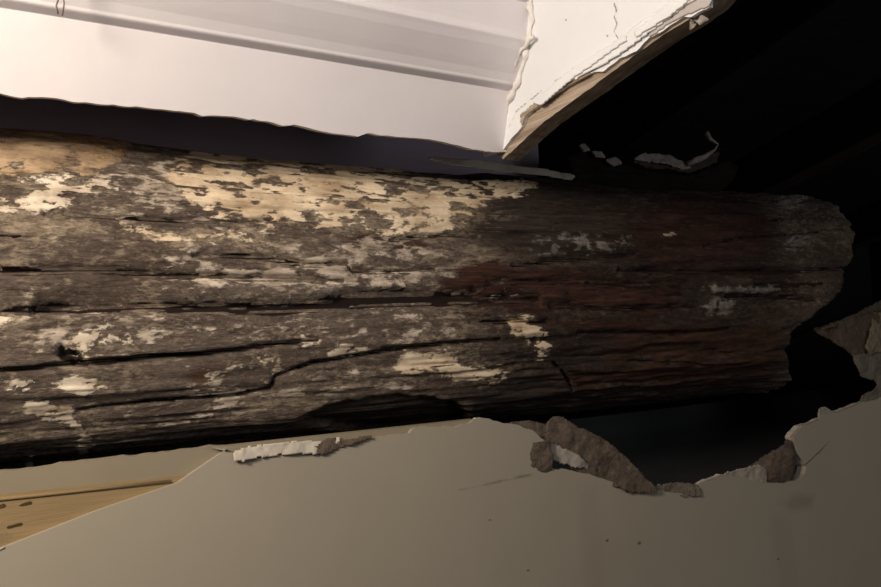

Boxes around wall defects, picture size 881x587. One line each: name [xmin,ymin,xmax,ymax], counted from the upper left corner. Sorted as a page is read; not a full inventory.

peeling [520,0,712,125]
peeling [0,128,539,310]
crack [389,234,476,242]
peeling [6,378,96,456]
peeling [51,374,108,396]
peeling [21,310,216,359]
crack [132,395,215,405]
spalling [231,307,508,462]
crack [0,253,843,393]
peeling [507,314,552,361]
flaking render [510,416,701,498]
flaking render [813,300,881,402]